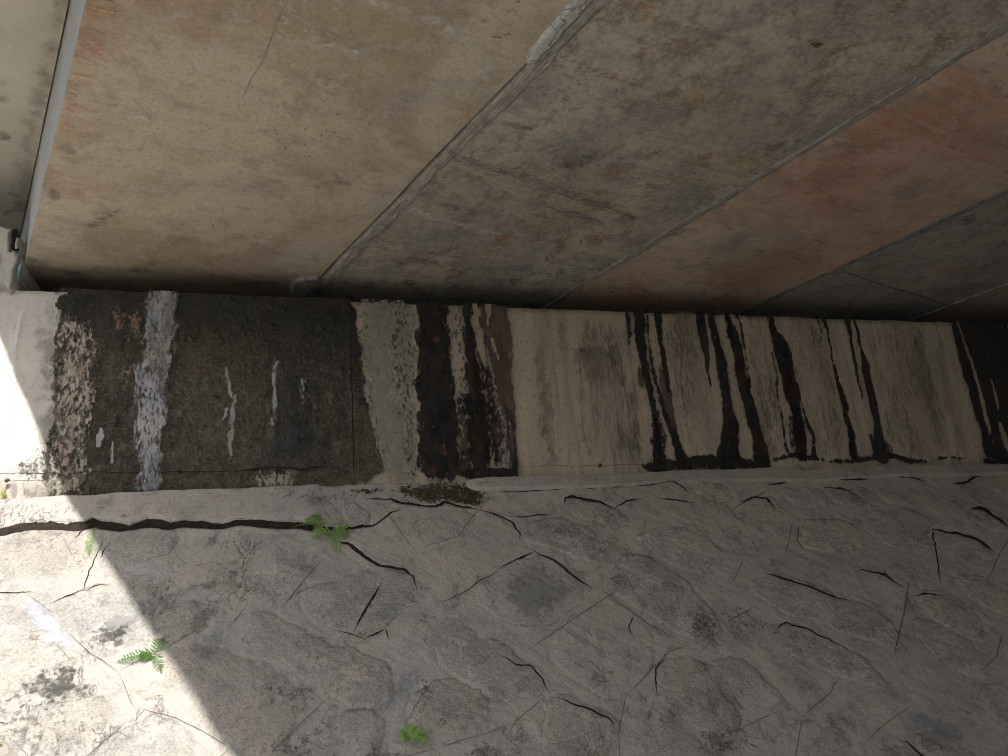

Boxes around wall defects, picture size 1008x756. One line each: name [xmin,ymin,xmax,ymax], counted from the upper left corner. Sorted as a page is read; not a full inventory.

peeling [525,0,595,64]
leakage [18,287,99,492]
leakage [134,290,177,488]
leakage [222,367,237,456]
leakage [358,299,518,484]
leakage [579,308,965,472]
leakage [952,321,1008,464]
crack [0,464,695,756]
crack [734,482,804,551]
crack [766,573,847,600]
crack [777,622,844,647]
crack [860,506,1008,653]